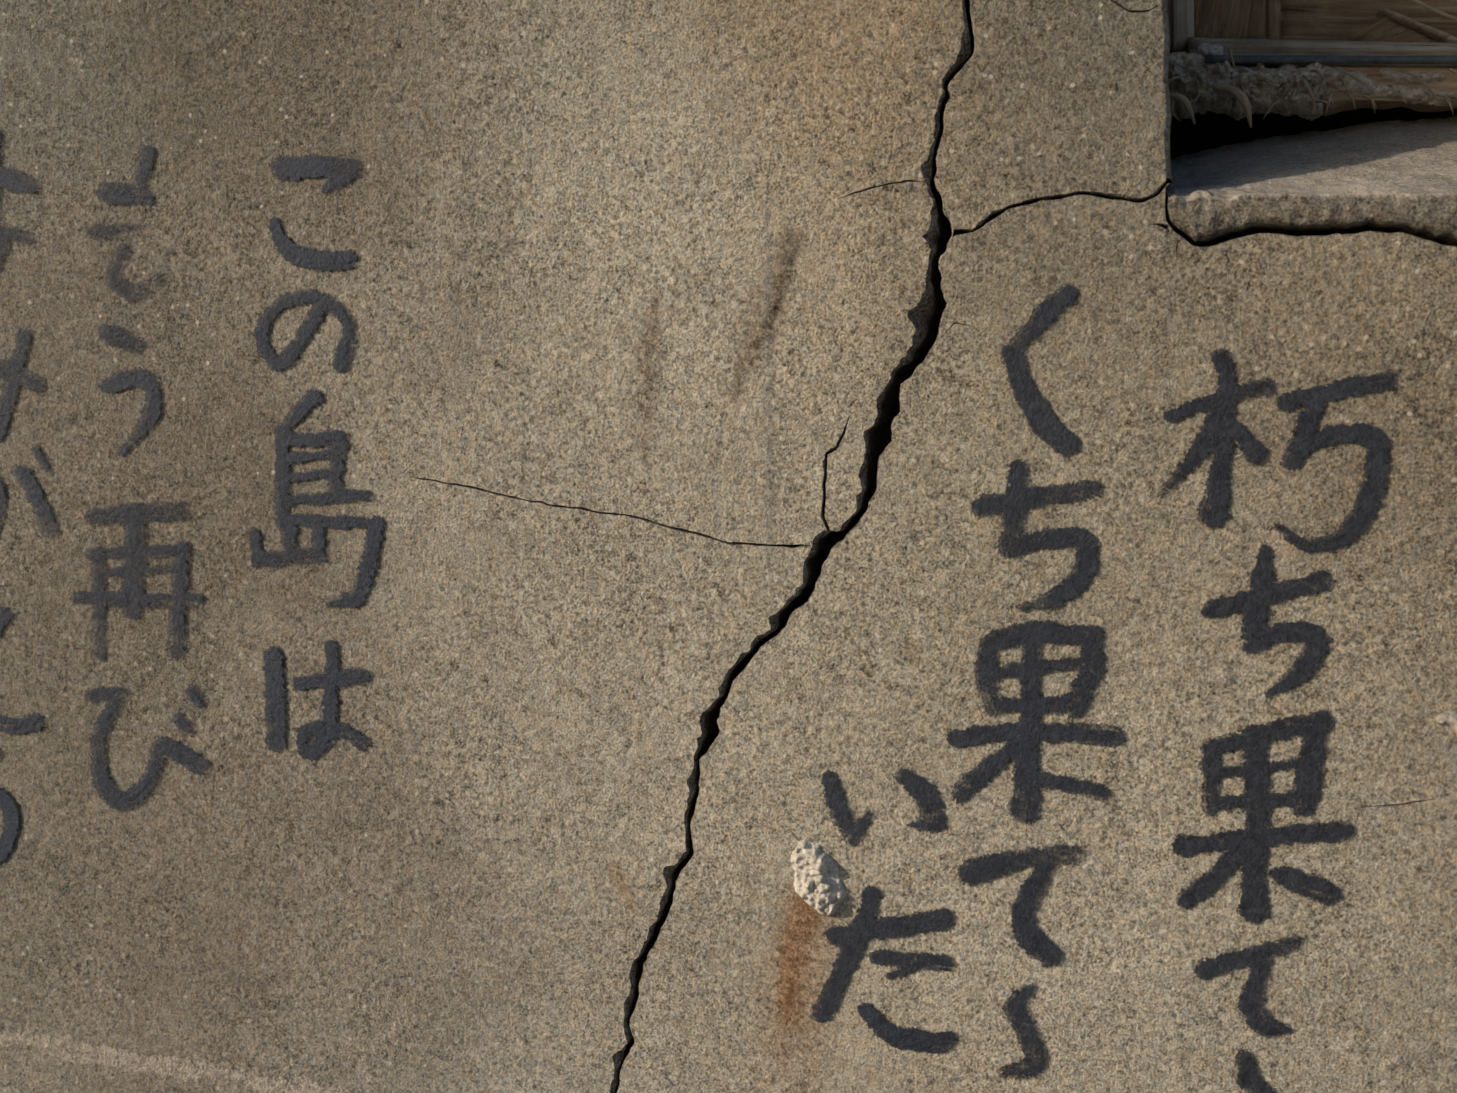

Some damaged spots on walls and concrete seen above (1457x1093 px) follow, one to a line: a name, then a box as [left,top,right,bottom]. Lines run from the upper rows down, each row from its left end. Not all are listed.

crack [412,0,1457,1093]